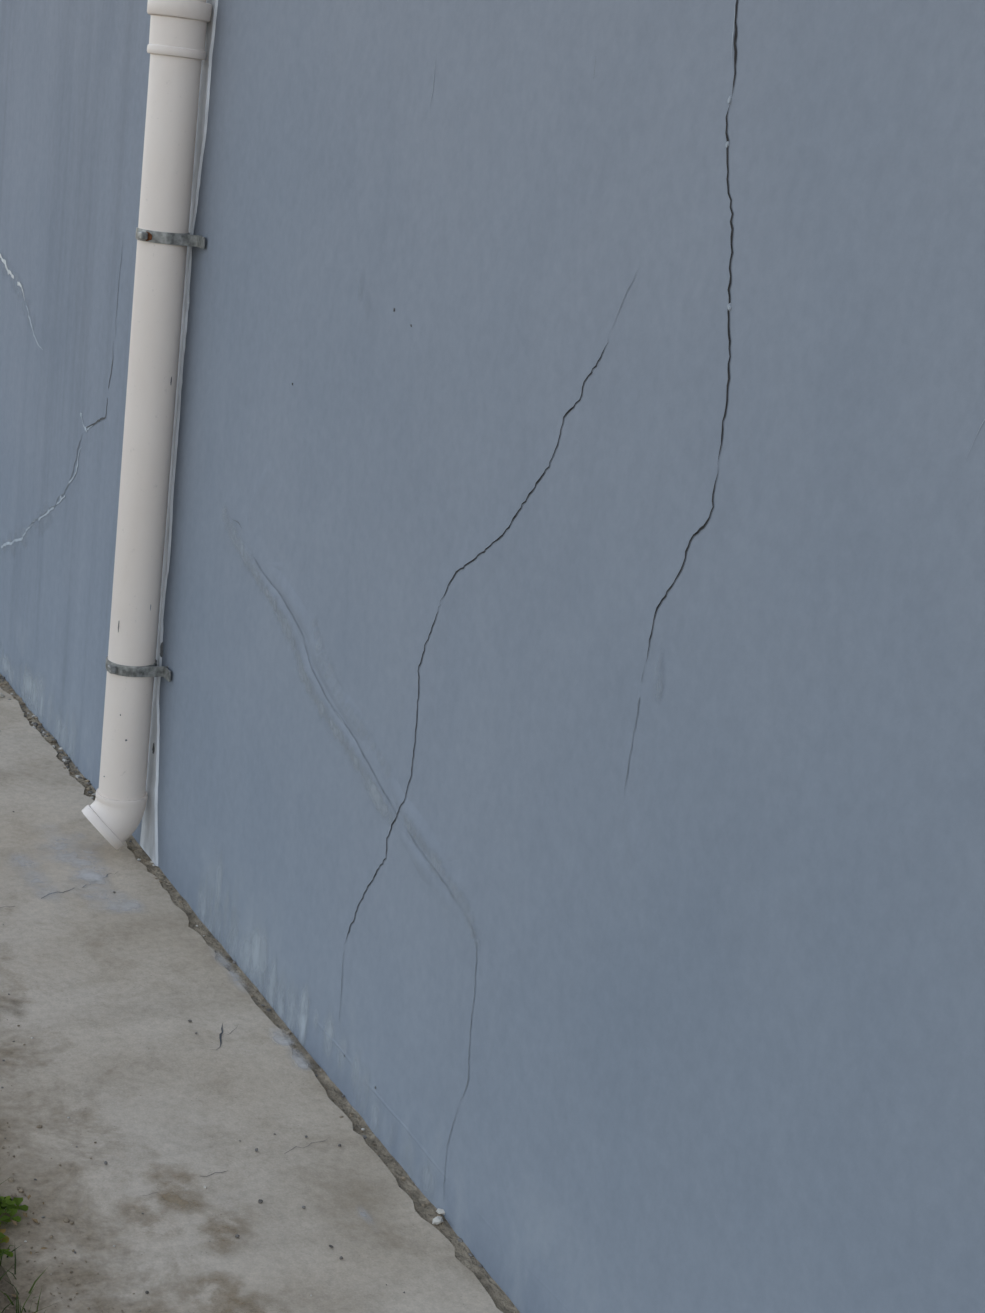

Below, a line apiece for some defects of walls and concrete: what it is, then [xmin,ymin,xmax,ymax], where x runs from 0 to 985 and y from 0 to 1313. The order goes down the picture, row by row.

crack [0,254,42,349]
crack [336,270,638,1030]
crack [619,0,758,898]
crack [211,1023,237,1050]